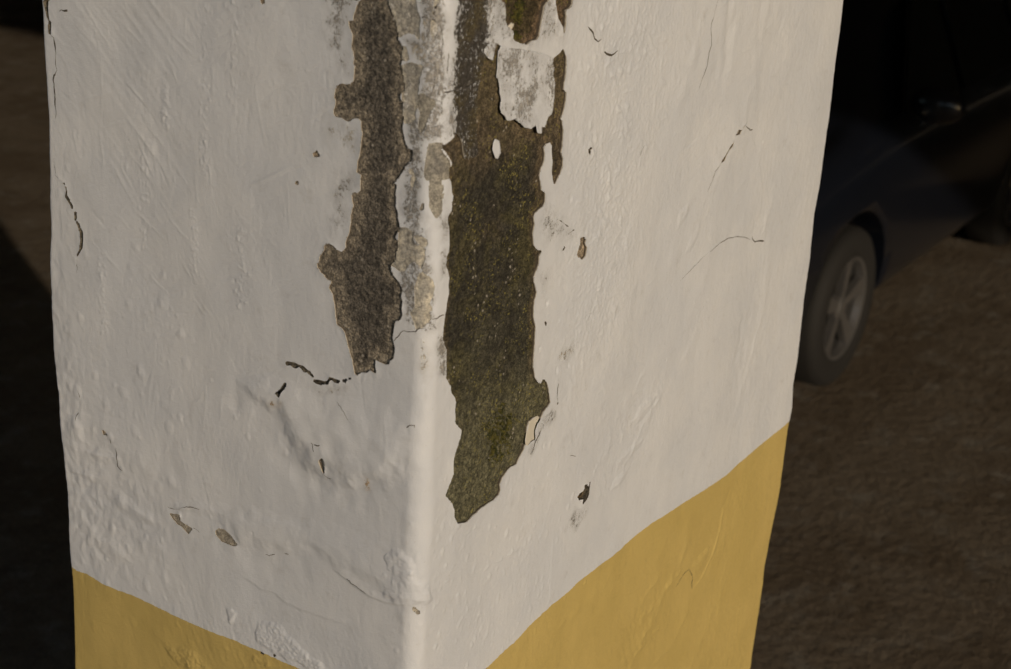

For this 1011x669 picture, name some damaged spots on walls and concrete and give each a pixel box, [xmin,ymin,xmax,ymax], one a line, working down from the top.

crack [43,0,67,119]
crack [54,166,83,256]
spalling [317,0,440,375]
crack [709,126,753,188]
spalling [420,0,573,524]
peeling [577,237,587,260]
crack [270,361,358,418]
peeling [168,507,200,534]
peeling [215,528,237,546]
spalling [577,482,590,504]